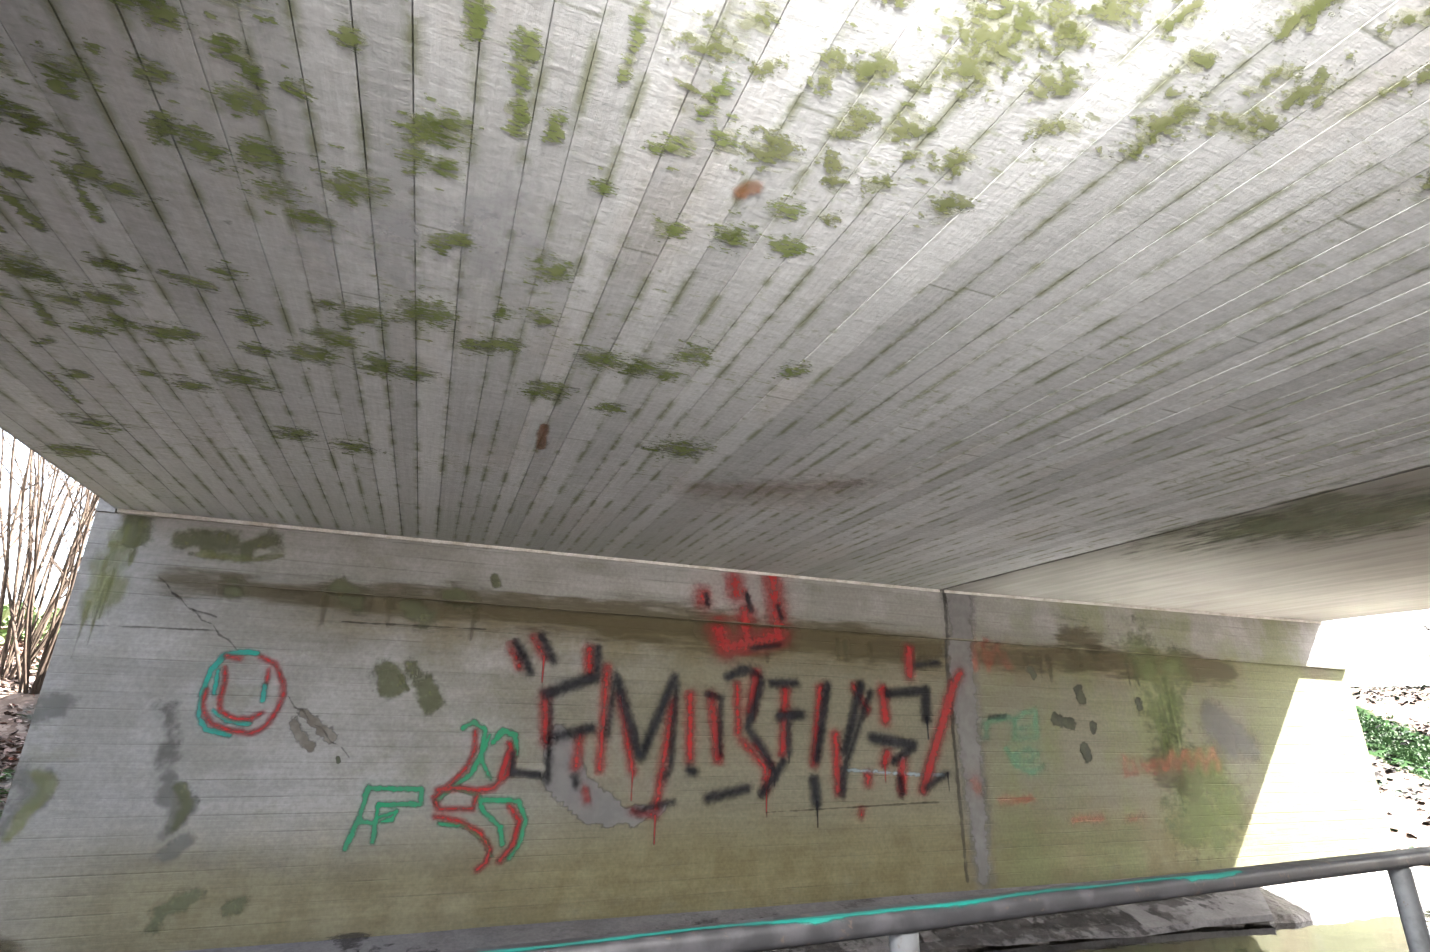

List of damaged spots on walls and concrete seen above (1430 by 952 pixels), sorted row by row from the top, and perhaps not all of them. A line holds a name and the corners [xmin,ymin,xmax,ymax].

water stain [22,693,72,721]
water stain [157,703,194,861]